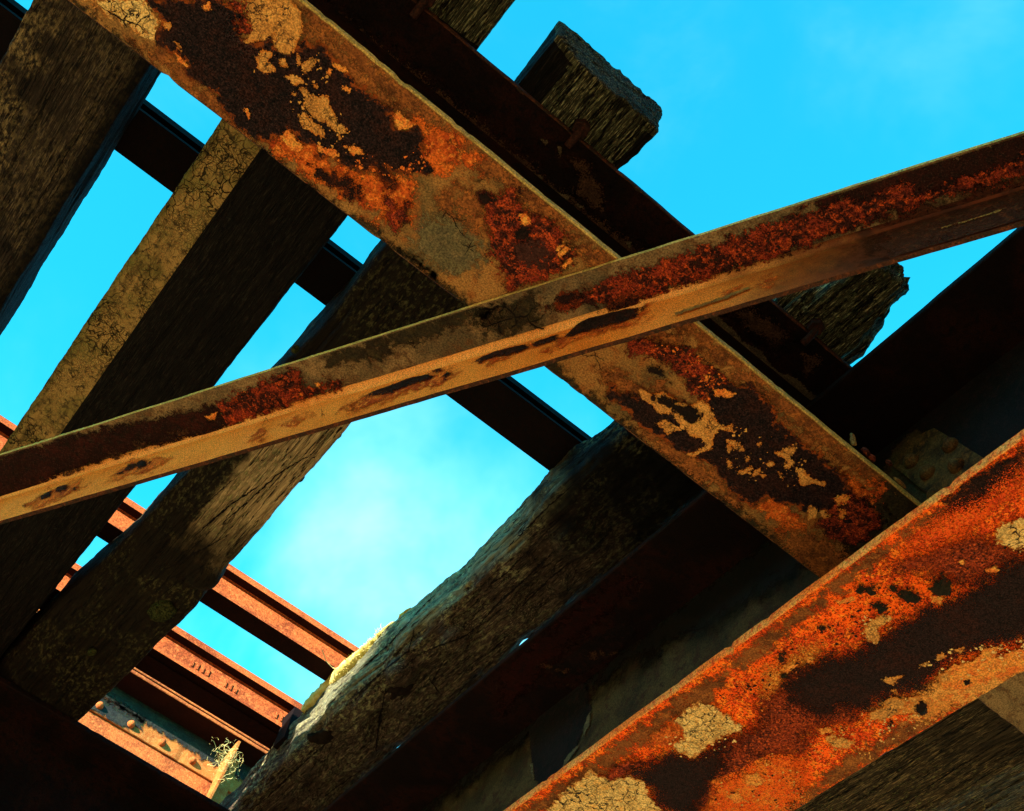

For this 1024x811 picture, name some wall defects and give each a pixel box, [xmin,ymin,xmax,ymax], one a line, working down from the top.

corrosion [132,40,423,240]
peeling [201,0,365,158]
corrosion [301,24,494,238]
corrosion [806,136,1024,267]
corrosion [22,478,91,509]
corrosion [631,425,849,577]
corrosion [896,457,1024,569]
peeling [993,514,1024,553]
corrosion [834,571,956,614]
peeling [665,701,743,759]
corrosion [701,750,816,811]
corrosion [863,665,1016,729]